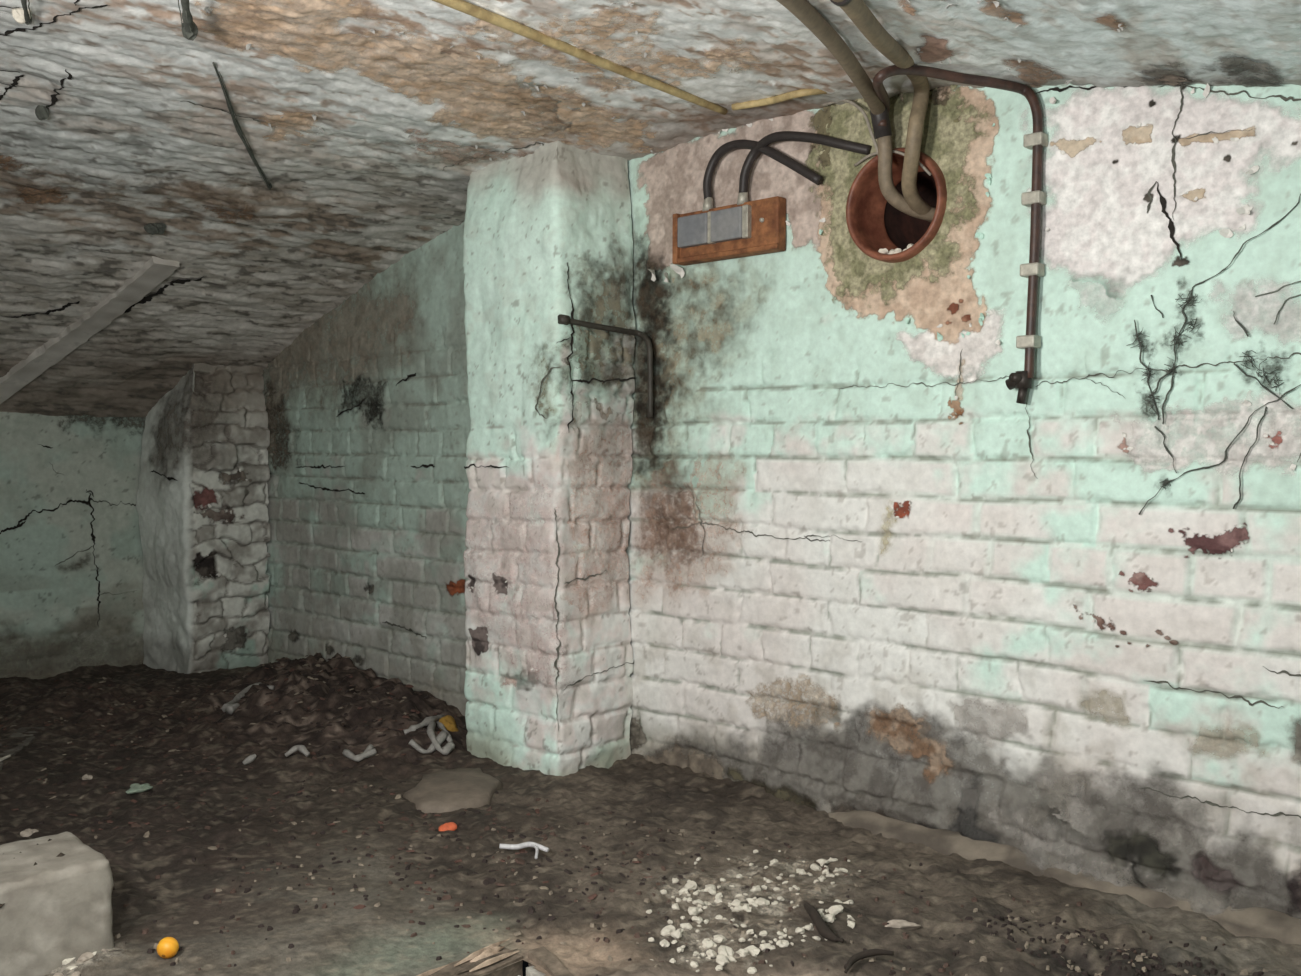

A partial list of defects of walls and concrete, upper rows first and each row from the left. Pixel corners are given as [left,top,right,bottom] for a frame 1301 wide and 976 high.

crack [0,70,24,100]
crack [0,0,108,36]
spalling [196,0,1003,383]
peeling [1003,59,1301,316]
crack [1036,85,1301,267]
damp [263,282,417,470]
damp [536,248,691,561]
peeling [1211,281,1301,343]
crack [0,444,137,624]
spalling [192,551,221,579]
spalling [468,627,489,656]
damp [644,675,1301,919]